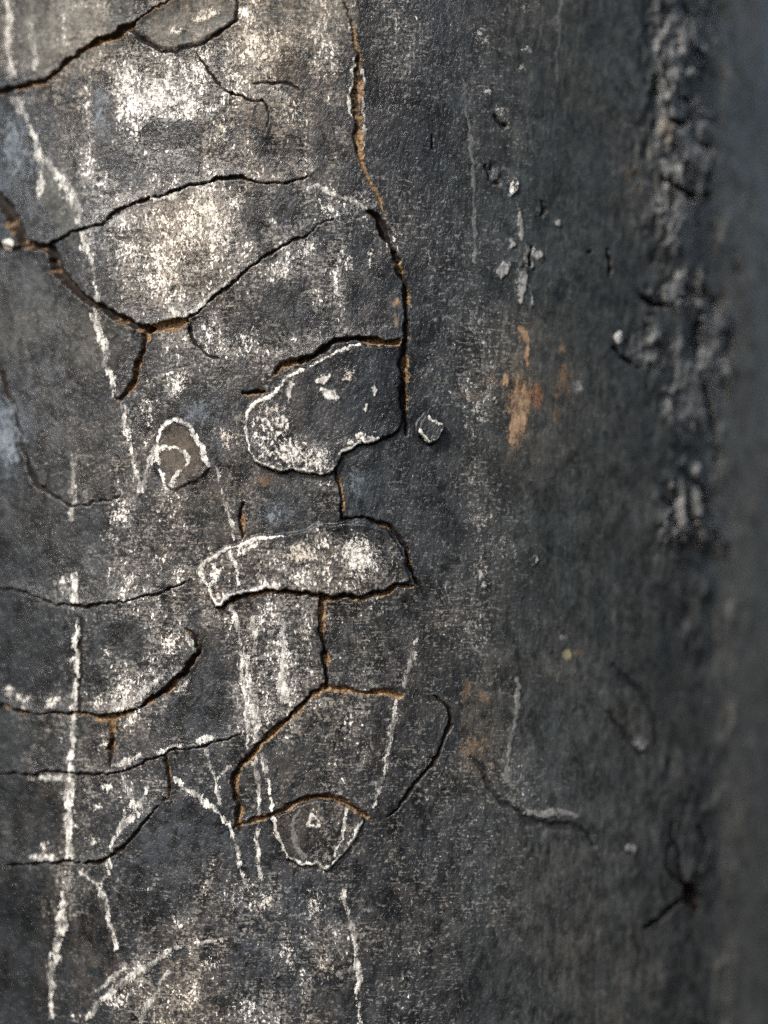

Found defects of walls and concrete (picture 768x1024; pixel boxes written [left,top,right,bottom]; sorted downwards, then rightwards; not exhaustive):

crack [0,0,300,128]
crack [0,174,335,403]
crack [241,0,411,436]
crack [0,370,119,507]
crack [0,467,453,867]